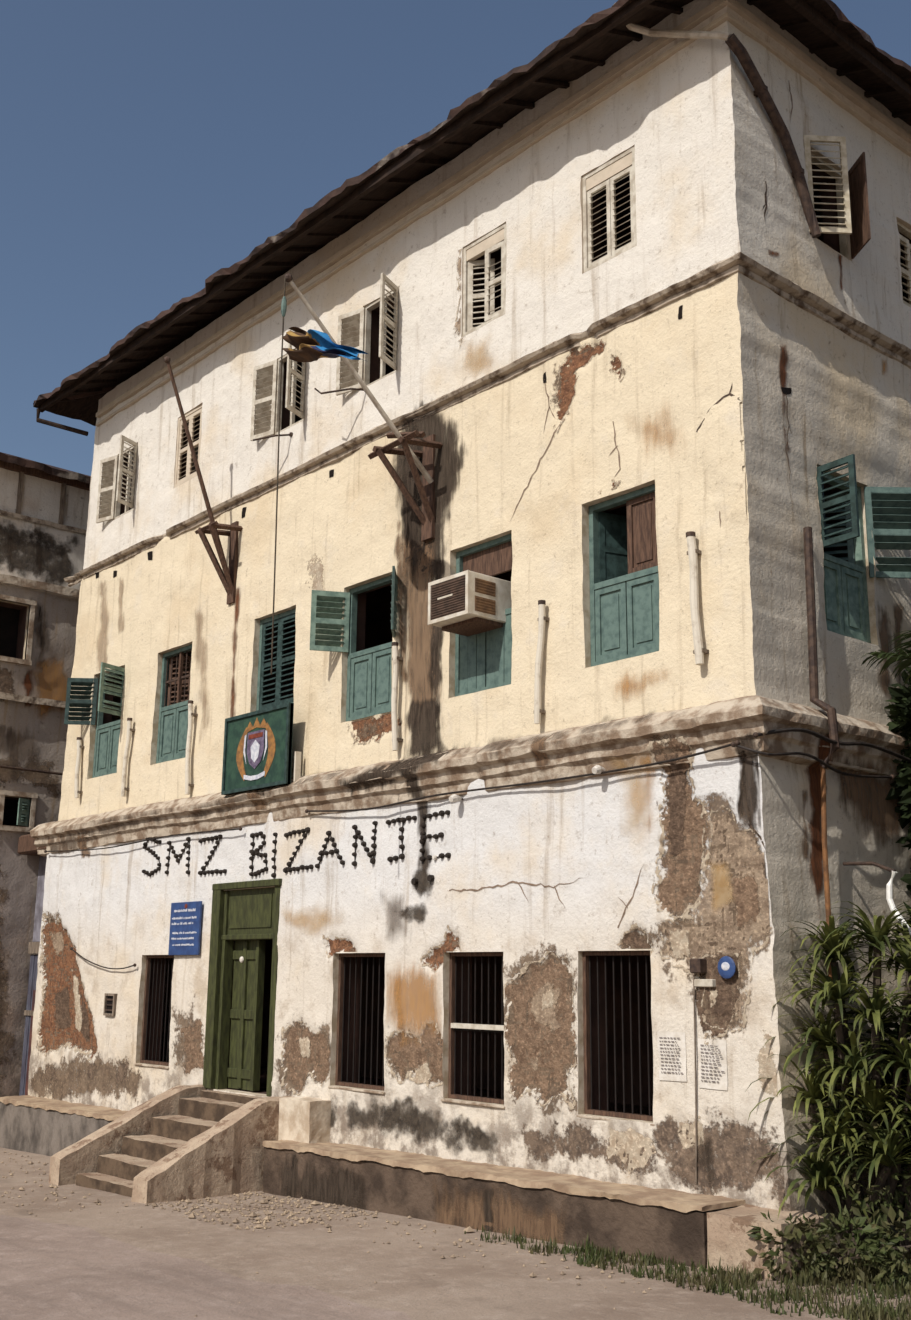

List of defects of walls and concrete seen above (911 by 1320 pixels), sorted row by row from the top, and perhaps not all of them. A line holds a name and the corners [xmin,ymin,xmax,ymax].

flaking render [543,339,625,432]
corrosion [779,347,787,411]
water stain [0,521,78,586]
water stain [328,402,463,930]
water stain [195,780,305,817]
flaking render [618,734,773,1045]
spalling [36,910,98,1062]
flaking render [275,1017,331,1096]
flaking render [385,1022,443,1088]
flaking render [503,943,578,1116]